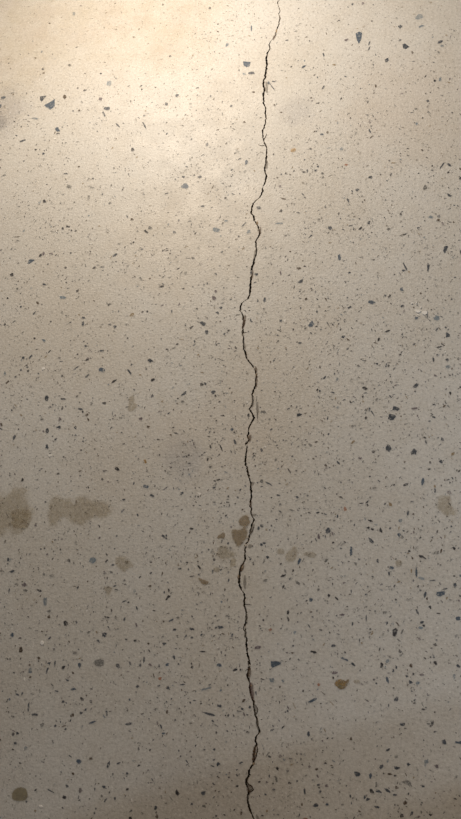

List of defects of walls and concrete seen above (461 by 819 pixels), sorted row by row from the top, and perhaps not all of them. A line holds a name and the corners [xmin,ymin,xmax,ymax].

crack [237,0,281,819]